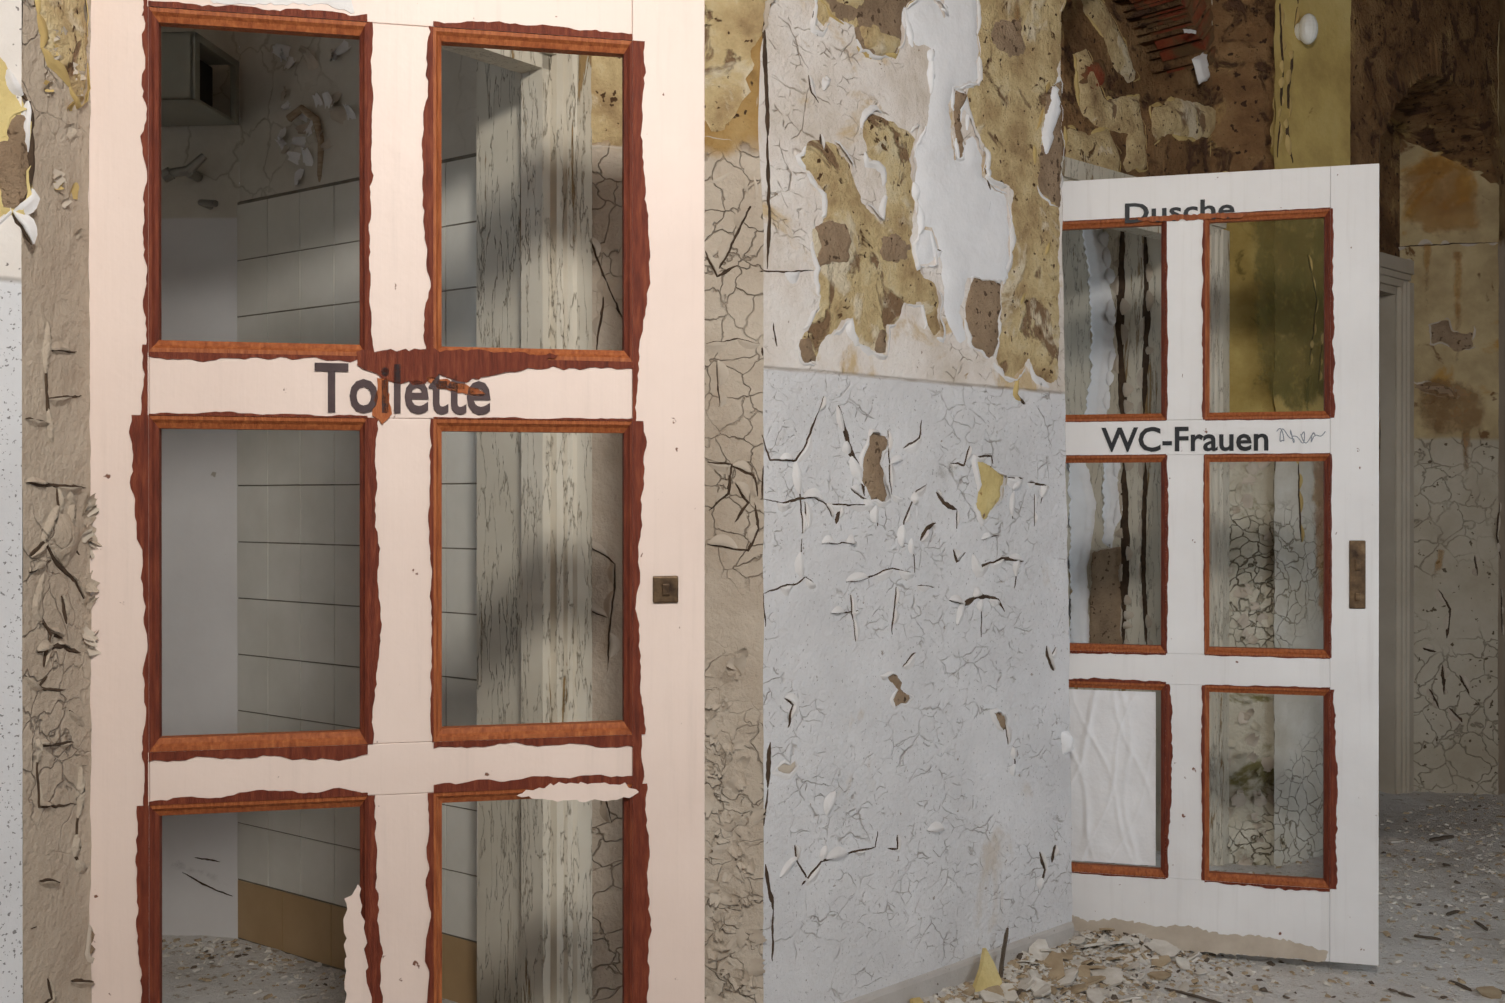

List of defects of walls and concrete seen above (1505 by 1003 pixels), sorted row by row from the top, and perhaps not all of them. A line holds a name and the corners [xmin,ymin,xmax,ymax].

flaking render [0,58,33,225]
flaking render [591,56,622,149]
flaking render [705,0,774,141]
peeling [795,0,1175,415]
crack [26,322,82,443]
flaking render [859,428,891,507]
crack [707,396,1049,670]
flaking render [972,454,1008,526]
crack [25,477,88,888]
crack [763,693,800,826]
crack [765,791,944,961]
crack [45,978,95,1003]